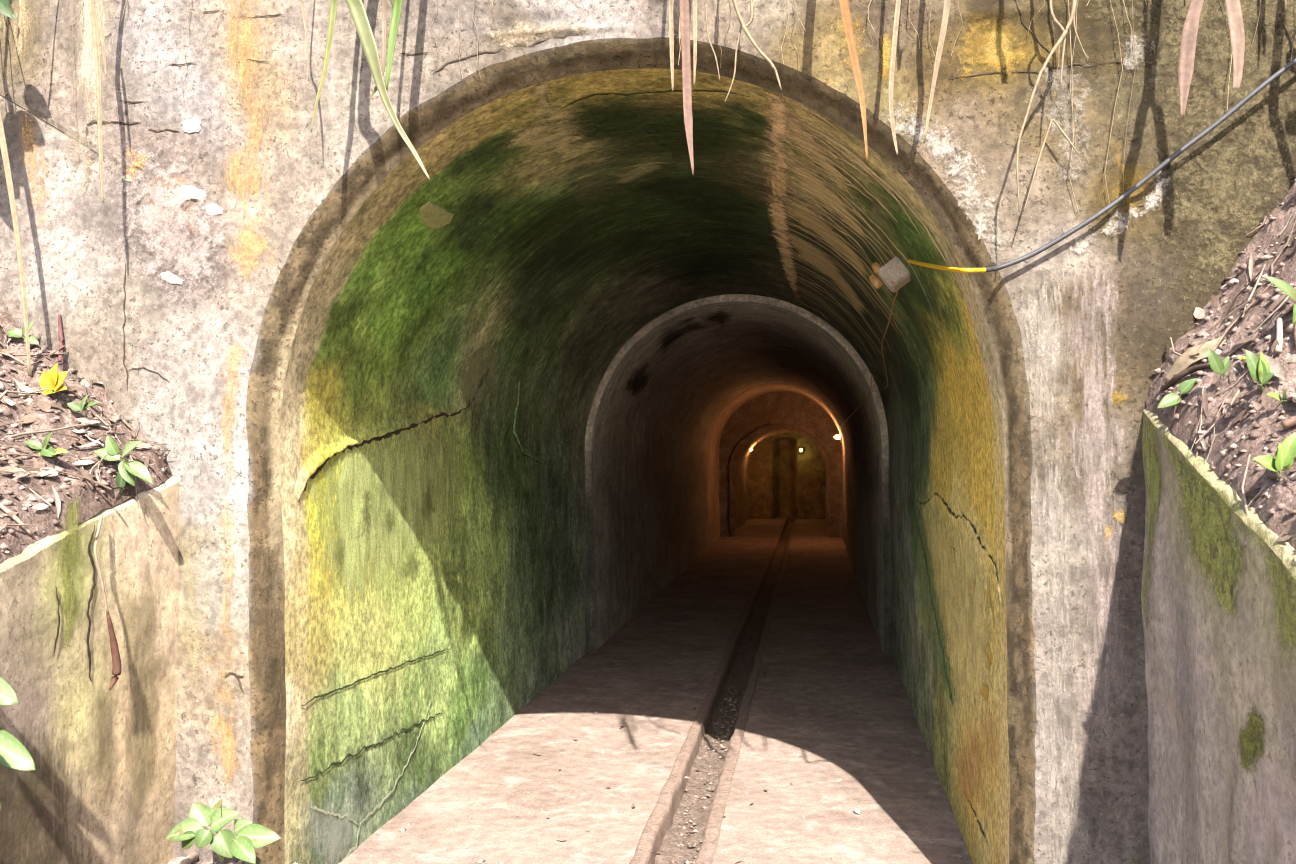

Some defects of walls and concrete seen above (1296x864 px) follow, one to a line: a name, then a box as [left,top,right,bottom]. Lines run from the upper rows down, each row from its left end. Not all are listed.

water stain [771,115,955,371]
water stain [889,104,1012,250]
crack [122,263,170,390]
crack [294,368,490,500]
water stain [1073,272,1123,662]
crack [53,525,96,682]
water stain [252,547,285,710]
water stain [309,702,431,864]
crack [299,710,444,783]
crack [300,648,451,706]
crack [914,493,1001,604]